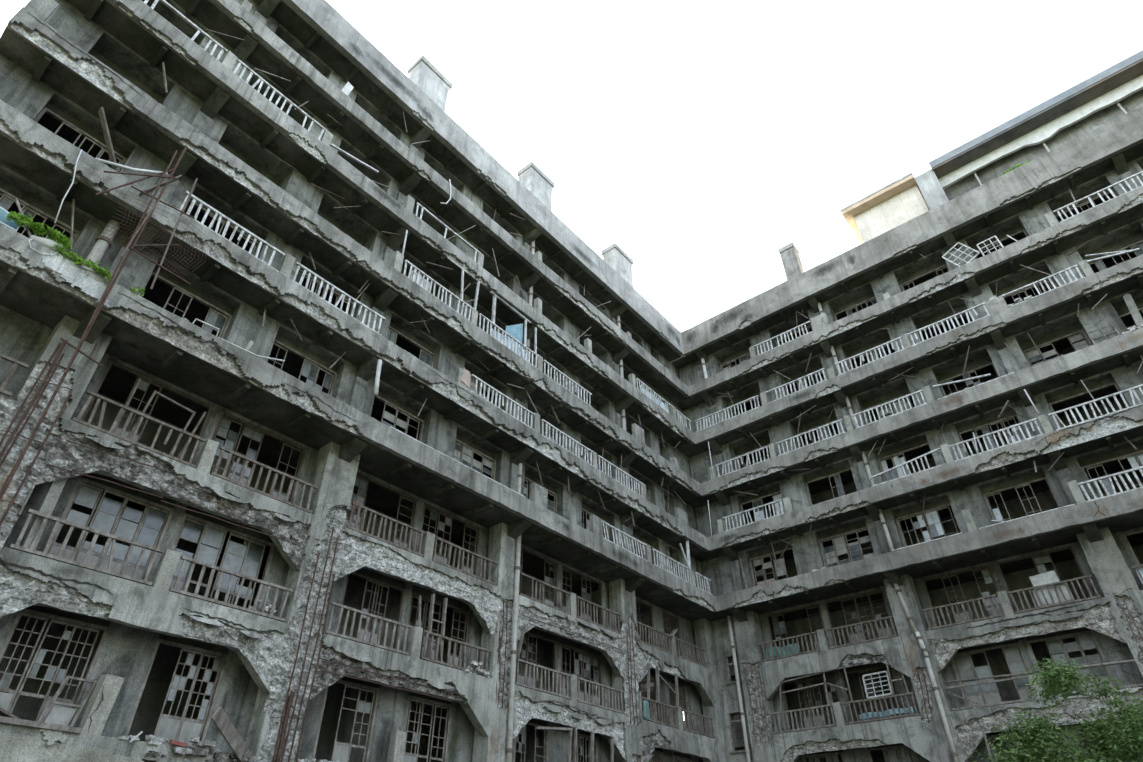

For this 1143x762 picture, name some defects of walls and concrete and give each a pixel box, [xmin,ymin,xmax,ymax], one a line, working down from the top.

crack [1035,404,1143,445]
spalling [0,339,684,762]
spalling [913,545,1143,723]
spalling [781,738,886,762]
spalling [955,687,1143,758]